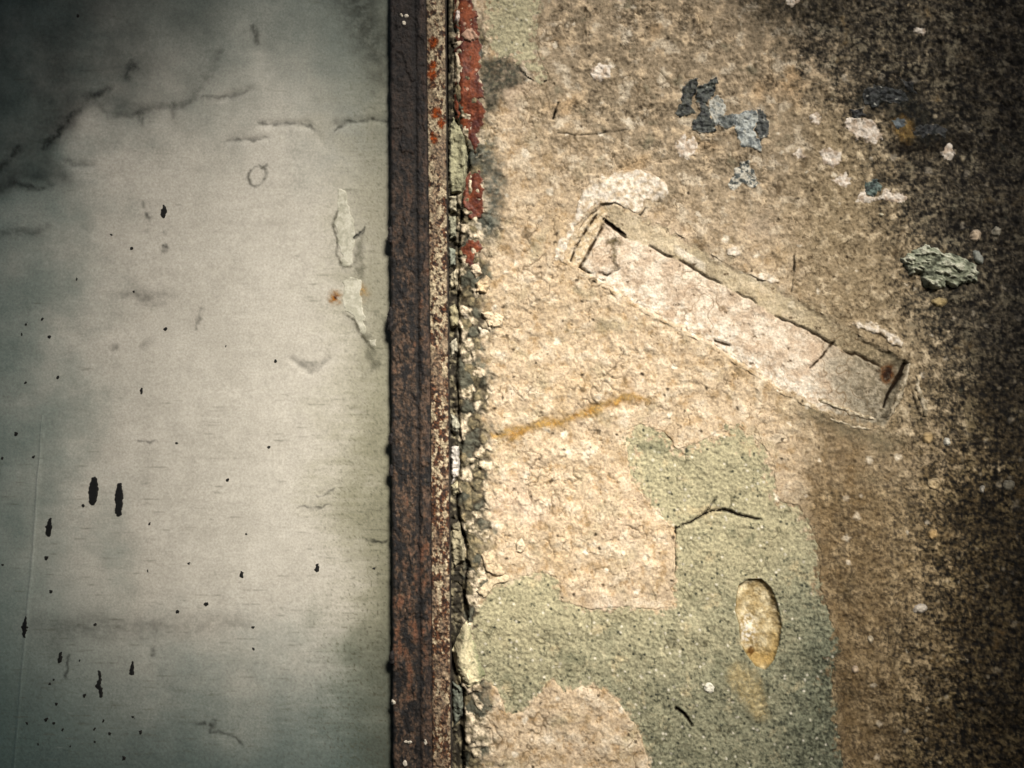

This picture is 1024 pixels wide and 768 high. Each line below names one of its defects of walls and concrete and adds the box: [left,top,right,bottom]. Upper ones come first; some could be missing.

flaking render [453,0,555,155]
rust [430,108,445,143]
peeling [675,76,769,191]
leakage [852,78,967,153]
peeling [463,170,485,220]
peeling [332,189,379,363]
peeling [458,239,492,294]
rust [492,393,647,440]
crack [674,496,760,568]
flaking render [467,421,846,768]